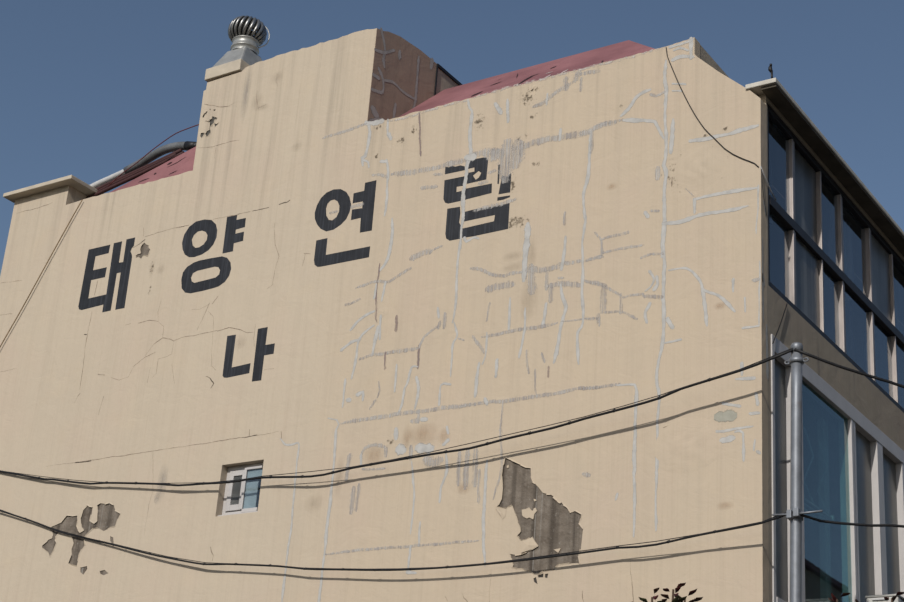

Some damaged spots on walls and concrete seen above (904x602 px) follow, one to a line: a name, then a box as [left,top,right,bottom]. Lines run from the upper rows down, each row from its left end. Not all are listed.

peeling [201,109,218,138]
peeling [42,502,121,574]
peeling [495,457,583,583]